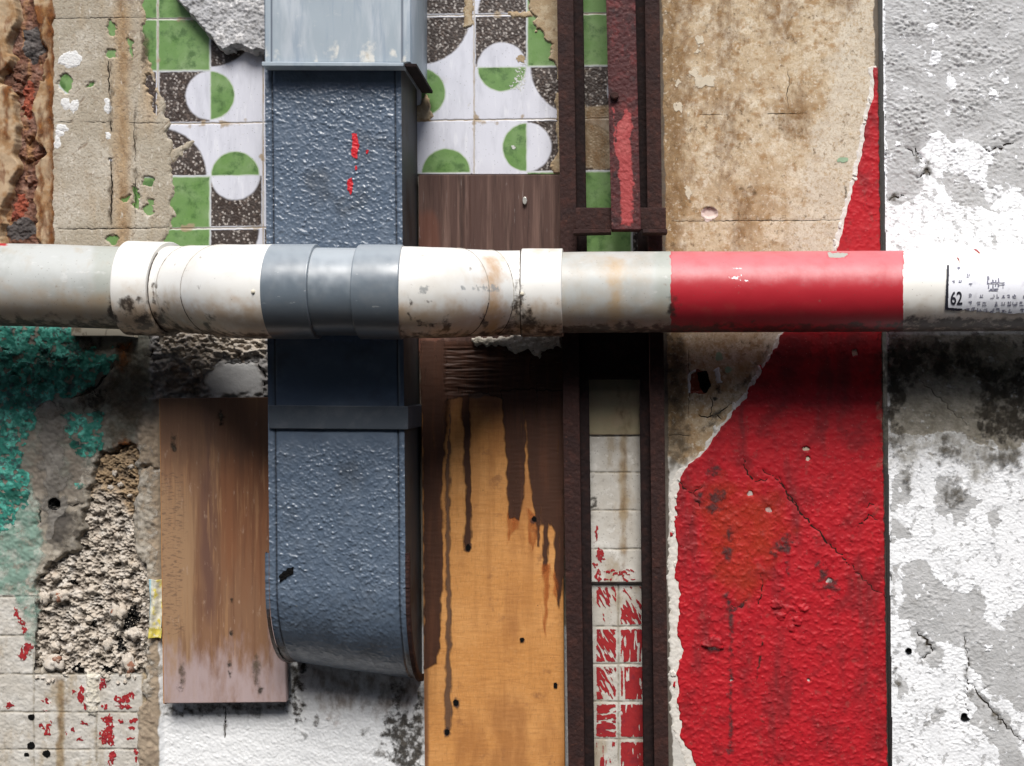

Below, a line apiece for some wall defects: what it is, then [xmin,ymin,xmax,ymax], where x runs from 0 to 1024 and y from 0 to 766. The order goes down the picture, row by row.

rust [3,61,14,138]
rust [34,0,55,244]
peeling [832,0,1024,251]
leakage [877,331,1024,476]
spalling [0,326,163,765]
leakage [166,661,306,722]
leakage [419,340,565,730]
peeling [592,526,643,766]
crack [743,458,886,598]
peeling [666,332,1024,766]
crack [917,632,933,658]
crack [964,636,1024,741]